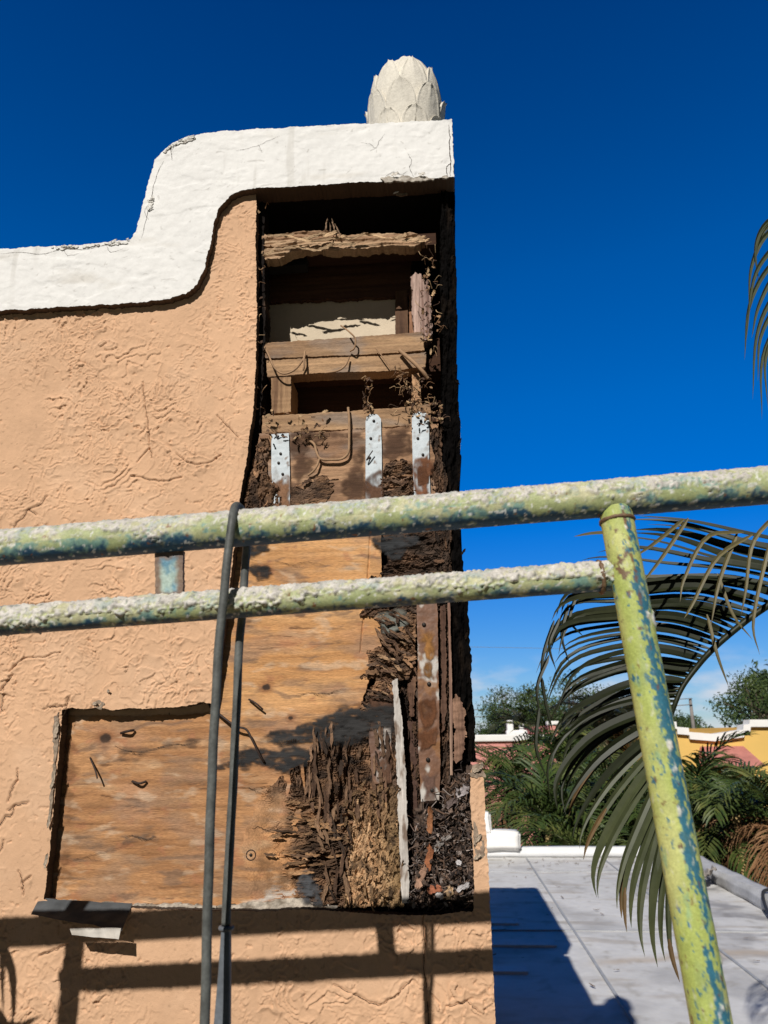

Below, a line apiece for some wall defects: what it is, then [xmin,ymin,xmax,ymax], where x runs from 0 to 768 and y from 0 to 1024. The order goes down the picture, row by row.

spalling [296,357,442,442]
rust [413,456,434,495]
peeling [361,611,418,704]
rust [422,634,434,678]
spalling [47,712,61,828]
spalling [400,760,486,914]